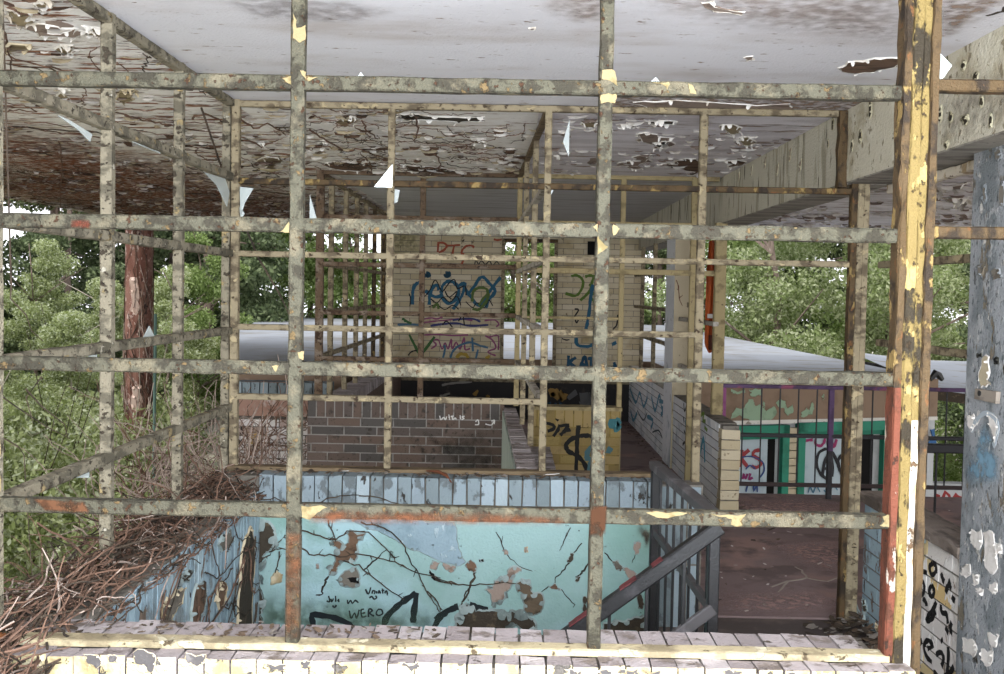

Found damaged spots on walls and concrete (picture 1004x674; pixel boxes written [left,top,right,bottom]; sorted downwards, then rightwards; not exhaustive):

peeling [600,69,618,103]
peeling [837,57,898,76]
peeling [305,109,598,179]
peeling [611,82,802,182]
crack [316,576,329,596]
peeling [316,519,484,589]
crack [461,573,476,605]
peeling [454,565,561,633]
crack [496,527,635,607]
peeling [602,594,645,635]
peeling [960,529,1003,596]
peeling [962,632,1000,667]